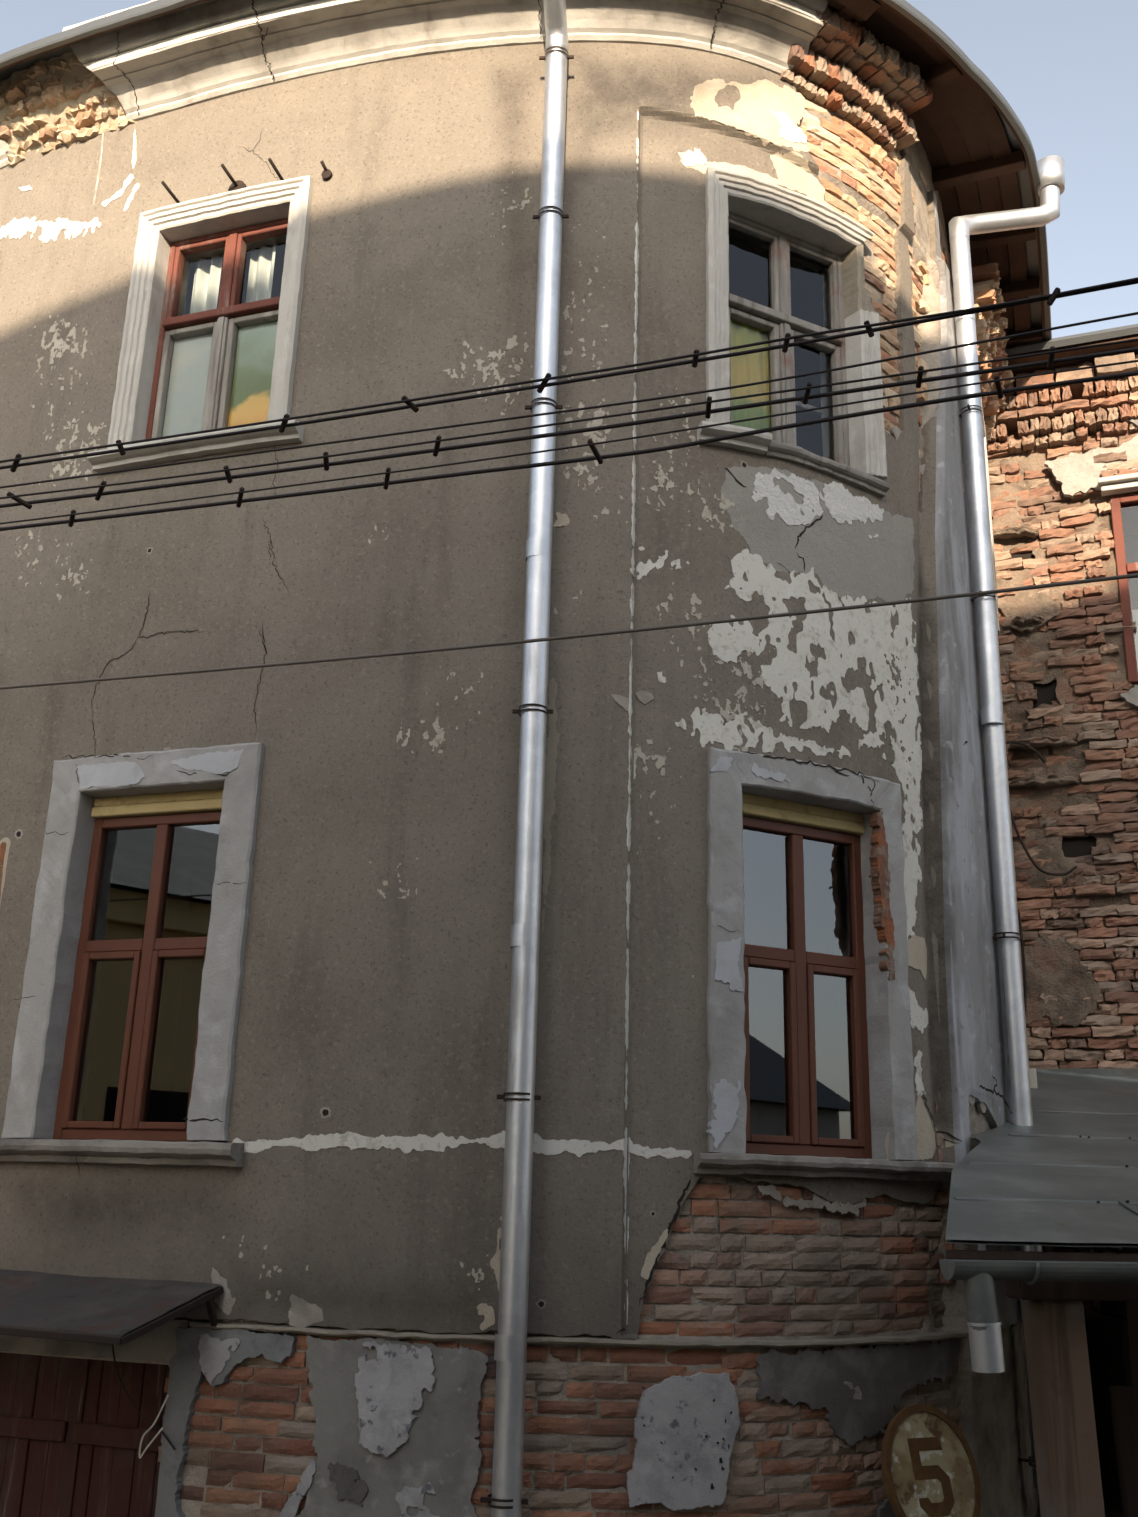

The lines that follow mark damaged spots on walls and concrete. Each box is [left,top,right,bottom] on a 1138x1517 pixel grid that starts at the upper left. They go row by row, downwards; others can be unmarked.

crack [710,0,724,49]
peeling [0,174,140,243]
crack [264,446,288,591]
crack [63,595,230,782]
crack [253,625,267,730]
peeling [533,79,955,1254]
rust [0,837,11,904]
flaking render [624,1176,956,1337]
peeling [355,1341,436,1457]
peeling [279,1459,369,1517]
peeling [396,1482,439,1517]